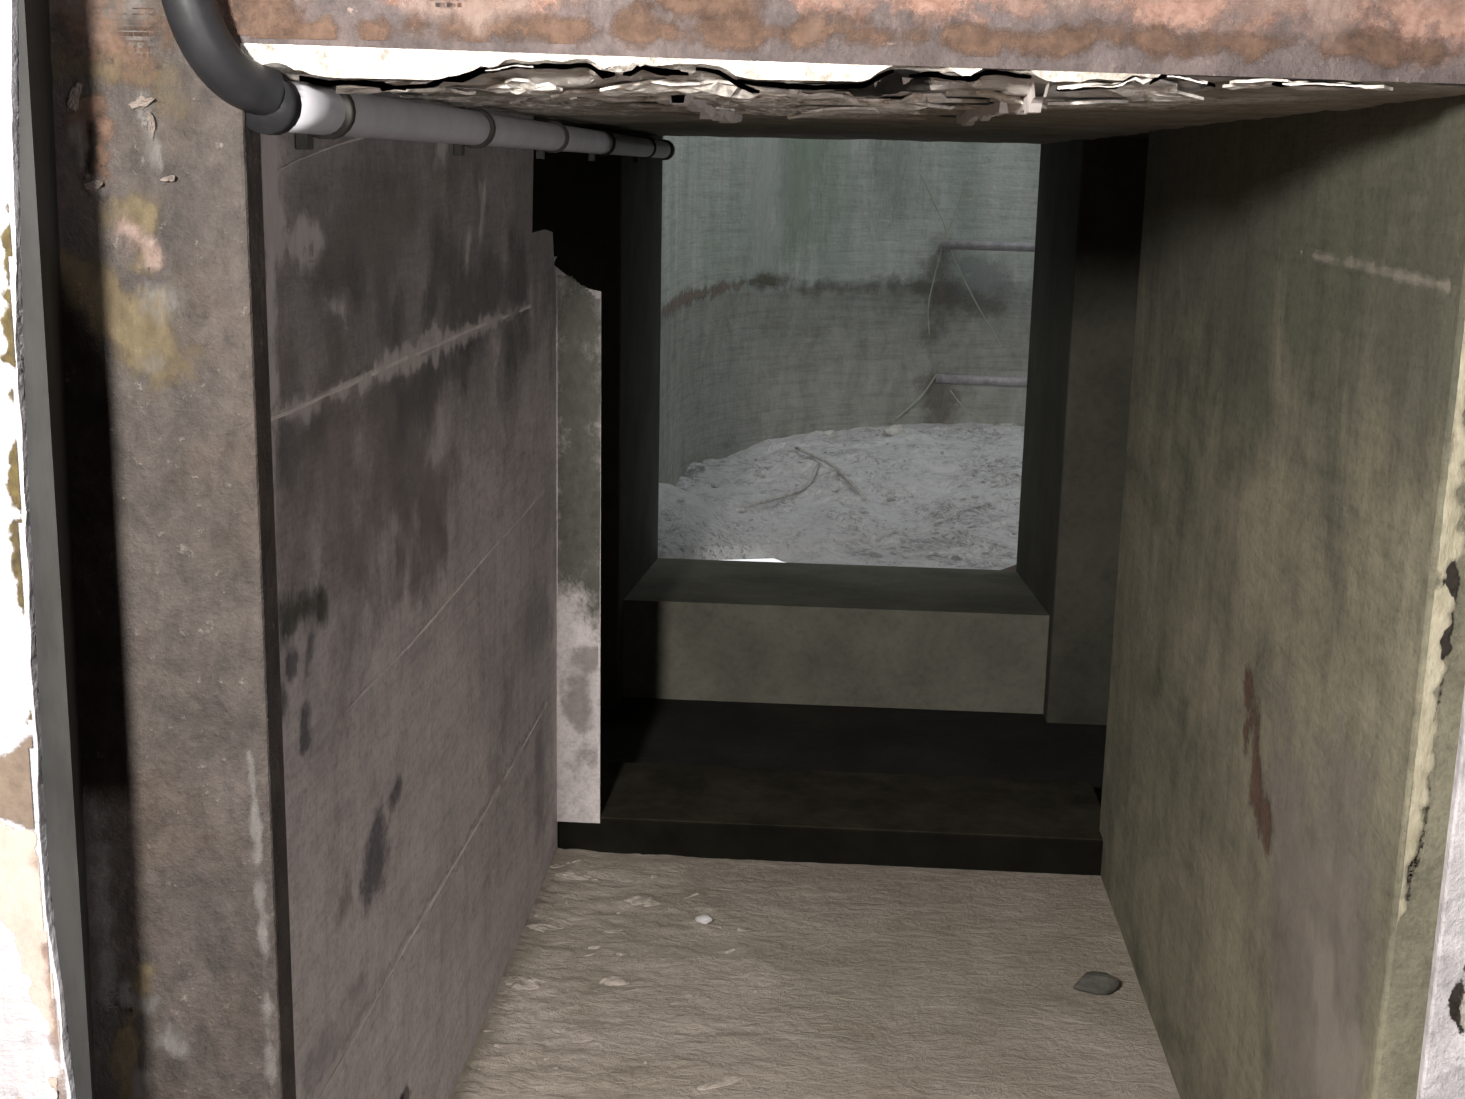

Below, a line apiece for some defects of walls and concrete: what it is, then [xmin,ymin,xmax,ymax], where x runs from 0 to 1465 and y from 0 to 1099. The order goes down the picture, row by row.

rust [223,0,338,41]
rust [358,0,1465,69]
peeling [293,63,1393,120]
leakage [260,134,528,597]
peeling [0,821,60,1042]
spalling [1448,966,1465,1036]
peeling [42,1076,60,1099]